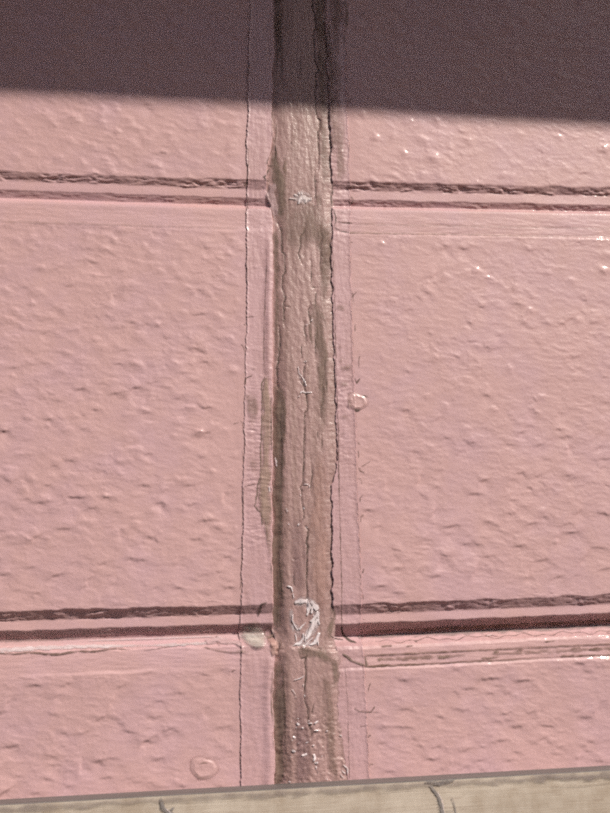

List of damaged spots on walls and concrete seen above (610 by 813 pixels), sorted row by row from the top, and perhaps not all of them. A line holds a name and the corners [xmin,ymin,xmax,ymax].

crack [244,0,364,599]
peeling [254,378,277,538]
peeling [290,599,321,648]
crack [331,604,356,643]
crack [301,657,314,736]